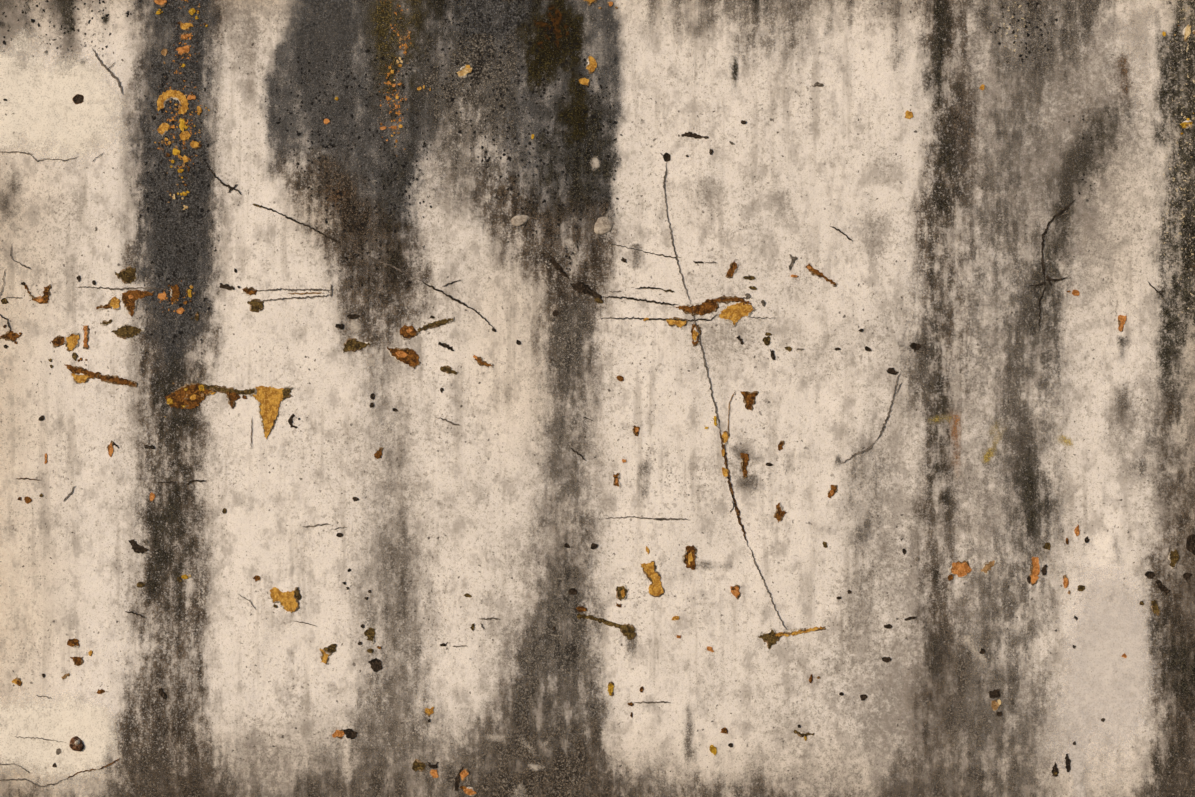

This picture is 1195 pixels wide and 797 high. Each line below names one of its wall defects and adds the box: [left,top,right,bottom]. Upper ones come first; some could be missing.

water stain [0,0,237,797]
peeling [48,266,199,388]
peeling [164,382,300,439]
water stain [258,0,624,404]
peeling [666,262,766,346]
crack [660,153,787,630]
crack [843,370,902,463]
water stain [883,0,1130,797]
crack [1030,199,1076,334]
peeling [253,575,301,613]
water stain [294,512,785,797]
water stain [1141,449,1195,797]